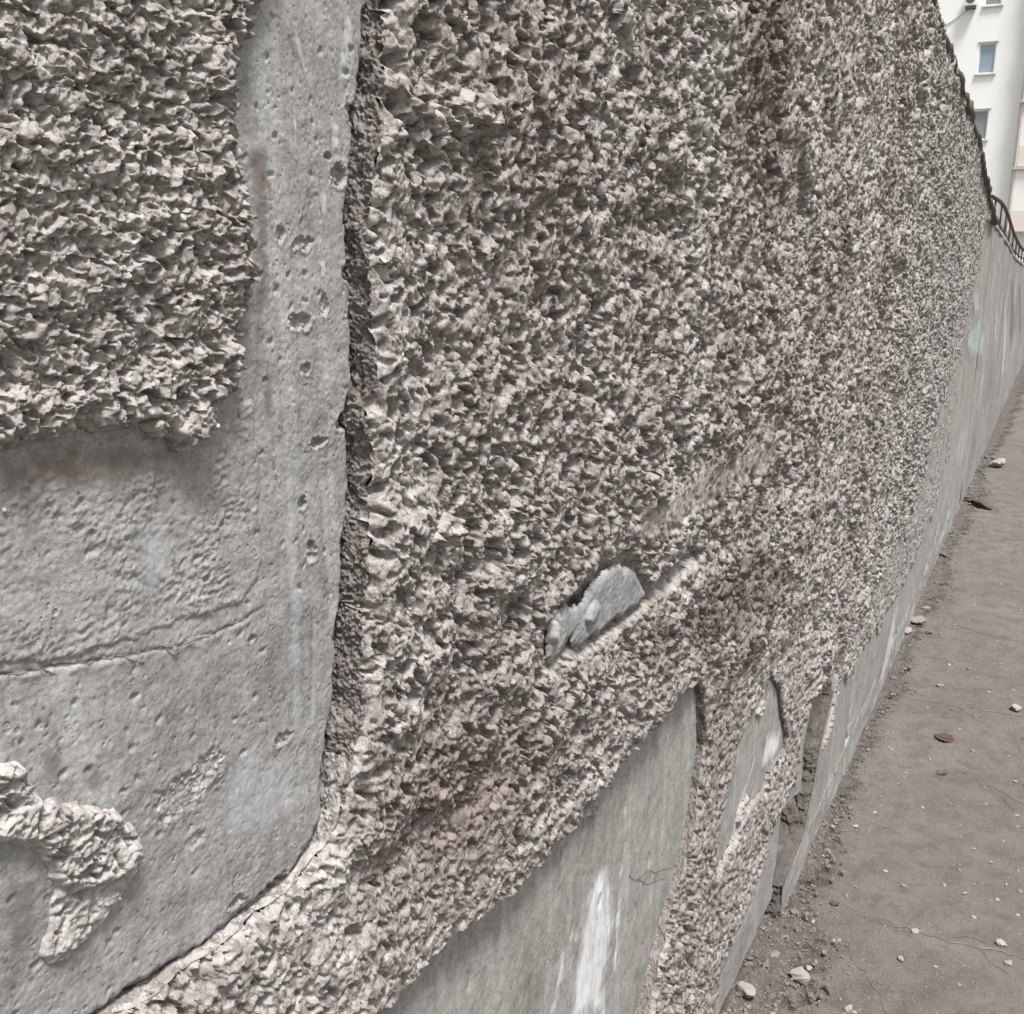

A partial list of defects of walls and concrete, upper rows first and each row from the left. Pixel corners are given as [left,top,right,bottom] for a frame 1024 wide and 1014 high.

spalling [276,224,313,250]
spalling [287,296,329,330]
spalling [323,0,387,811]
spalling [0,398,263,665]
crack [0,603,265,675]
spalling [545,563,645,663]
spalling [156,750,225,824]
spalling [274,730,293,746]
spalling [716,677,788,863]
peeling [0,761,144,965]
spalling [186,828,206,847]
spalling [382,681,706,1014]